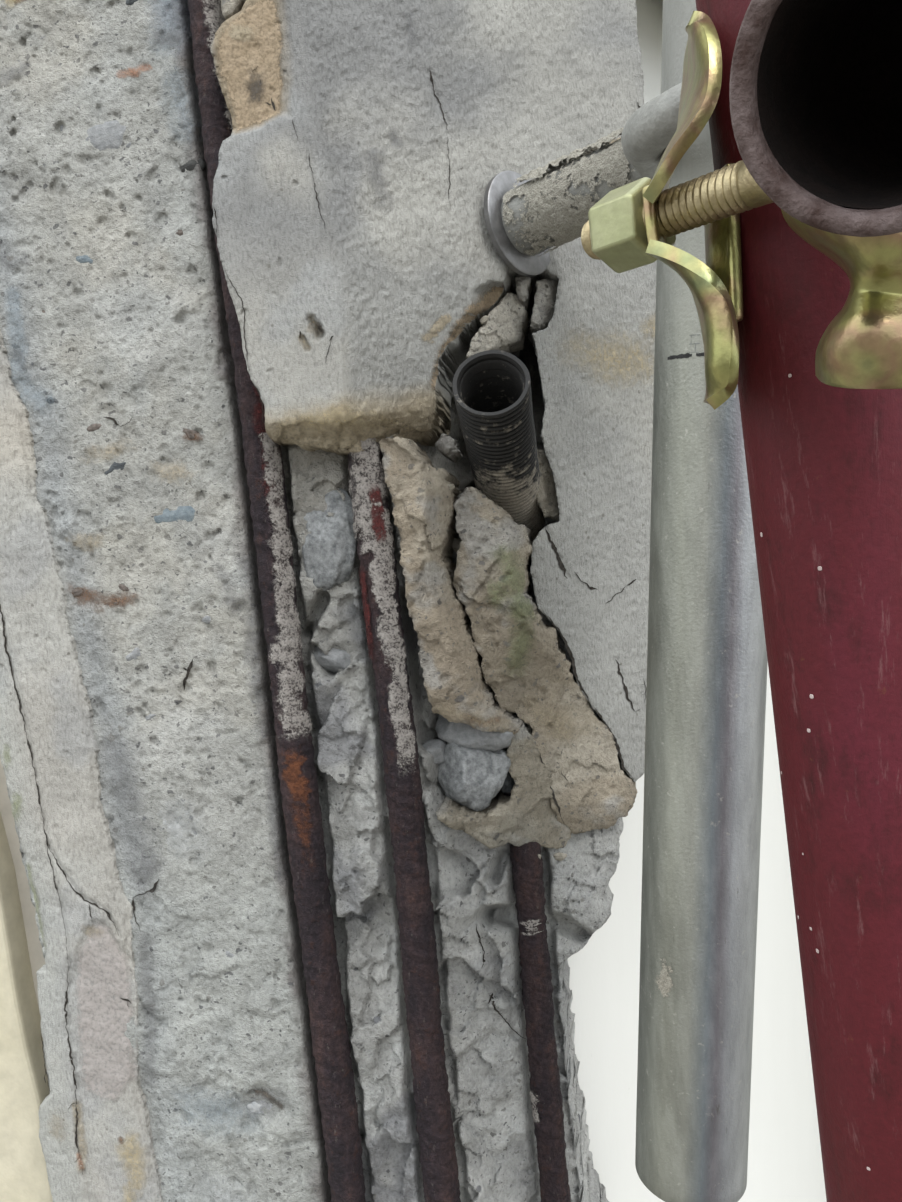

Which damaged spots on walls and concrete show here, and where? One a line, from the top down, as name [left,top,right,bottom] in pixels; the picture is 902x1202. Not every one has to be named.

flaking render [203,0,283,131]
rust [253,388,266,437]
rust [370,487,386,540]
flaking render [259,404,426,768]
crack [545,529,636,603]
crack [545,615,631,776]
crack [615,659,646,711]
crack [0,604,159,1174]
peeling [519,919,544,936]
peeling [530,1091,540,1123]